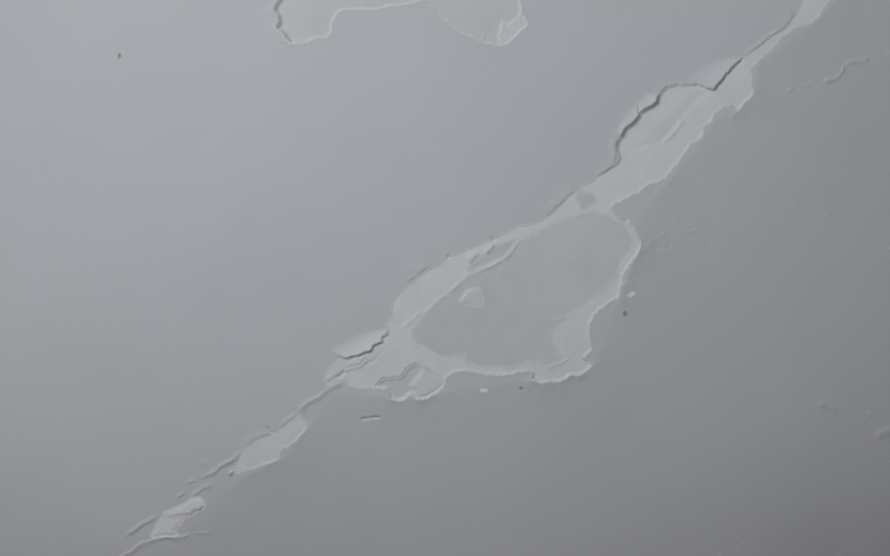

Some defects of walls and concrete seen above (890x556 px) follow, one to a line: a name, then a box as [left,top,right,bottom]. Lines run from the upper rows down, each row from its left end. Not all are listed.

peeling [312,0,843,415]
peeling [225,405,317,483]
peeling [149,496,206,539]